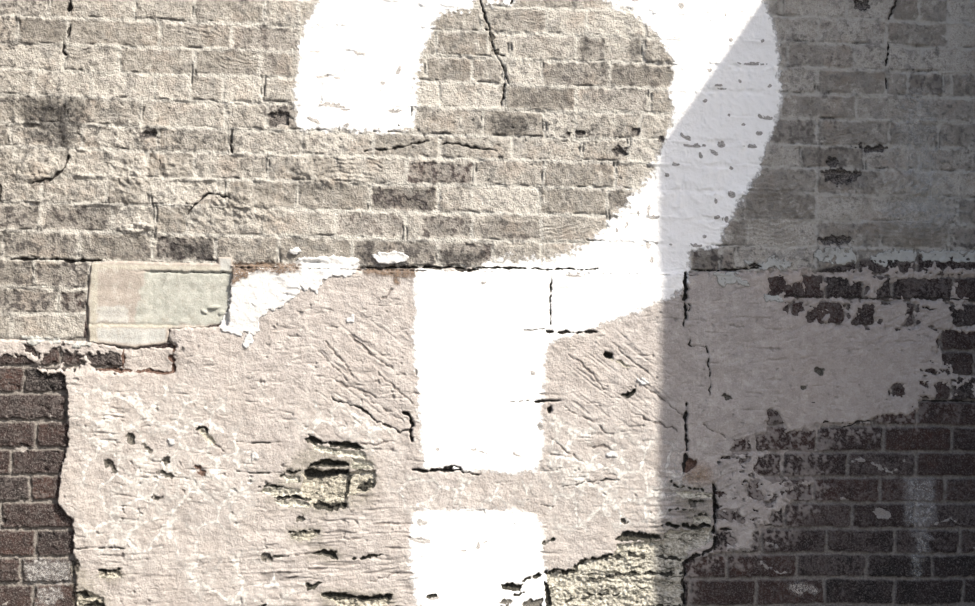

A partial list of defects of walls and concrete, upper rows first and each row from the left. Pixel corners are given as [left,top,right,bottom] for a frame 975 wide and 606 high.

crack [480,0,508,105]
crack [366,265,598,335]
crack [682,263,762,393]
peeling [813,234,857,265]
peeling [870,248,975,267]
flaking render [258,434,376,542]
crack [296,398,414,456]
crack [391,400,697,531]
flaking render [261,552,283,562]
flaking render [312,549,338,560]
flaking render [500,480,713,606]
crack [680,484,732,604]